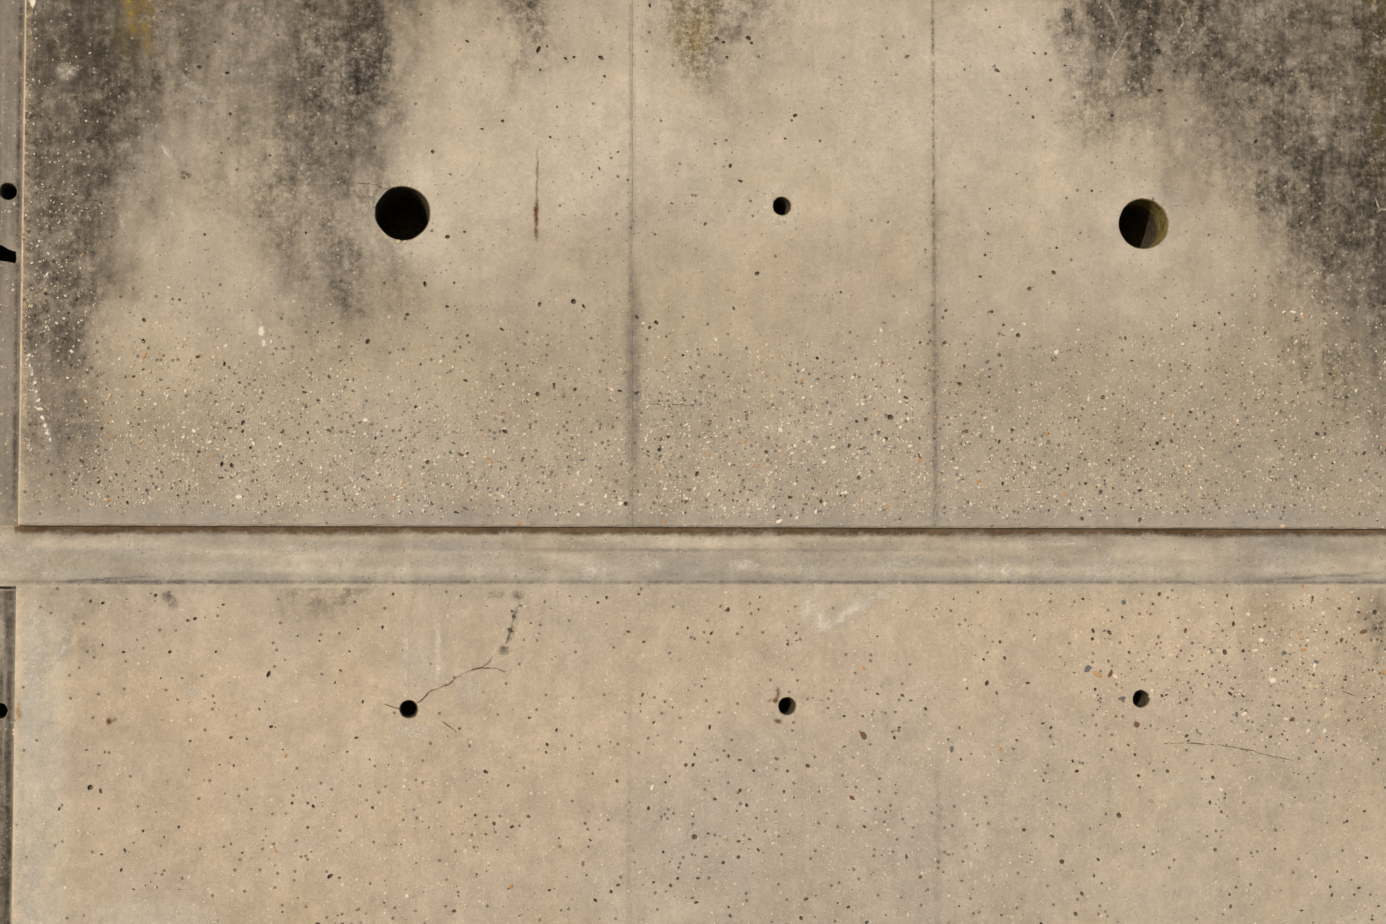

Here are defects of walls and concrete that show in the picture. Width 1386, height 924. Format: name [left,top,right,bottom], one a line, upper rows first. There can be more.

water stain [15,0,161,432]
water stain [304,0,378,120]
water stain [1064,0,1386,326]
crack [386,594,519,732]